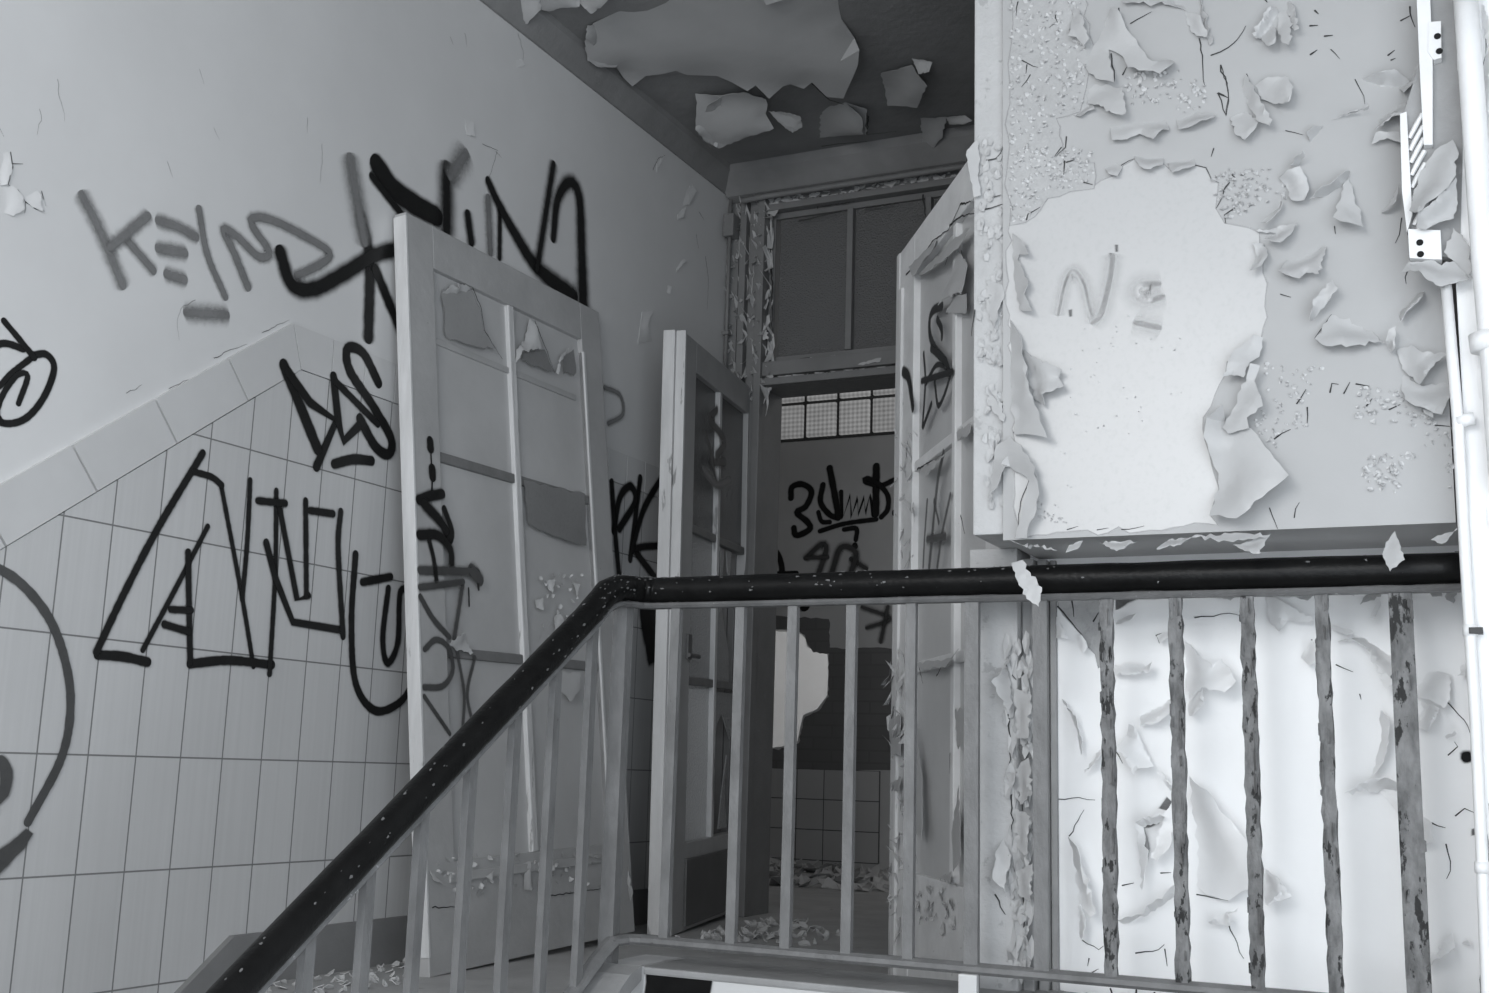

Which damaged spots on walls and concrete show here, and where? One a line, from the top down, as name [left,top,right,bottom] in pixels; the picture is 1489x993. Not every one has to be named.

peeling [521,0,897,148]
peeling [1068,0,1340,140]
peeling [1480,1,1489,137]
peeling [724,196,778,416]
peeling [881,50,1476,675]
flaking render [772,615,961,948]
peeling [991,631,1034,984]
peeling [1059,797,1102,972]
peeling [1062,631,1237,923]
peeling [1189,776,1292,959]
peeling [1332,626,1392,689]
peeling [1417,659,1471,763]